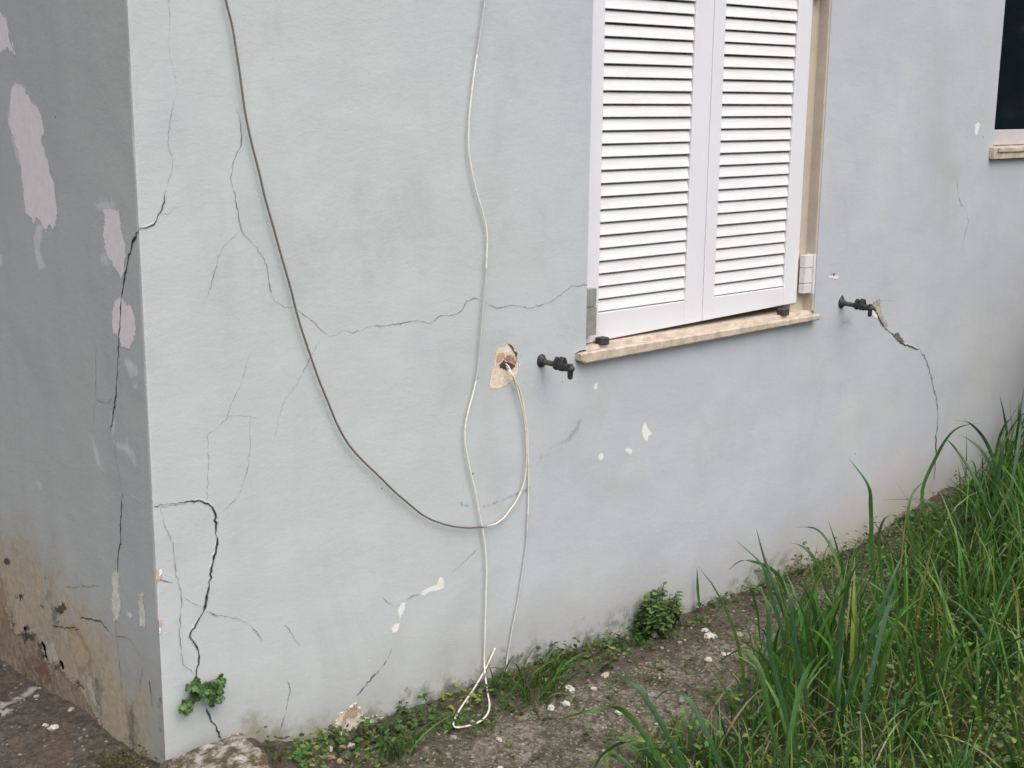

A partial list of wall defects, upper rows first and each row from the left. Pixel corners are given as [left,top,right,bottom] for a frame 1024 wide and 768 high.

peeling [0,11,16,55]
peeling [3,82,57,278]
peeling [89,188,126,279]
peeling [112,297,142,397]
crack [93,165,173,458]
spalling [489,343,519,389]
crack [874,307,939,480]
leakage [0,458,165,765]
crack [117,493,236,677]
peeling [390,574,446,636]
crack [206,708,221,738]
spalling [334,702,384,736]